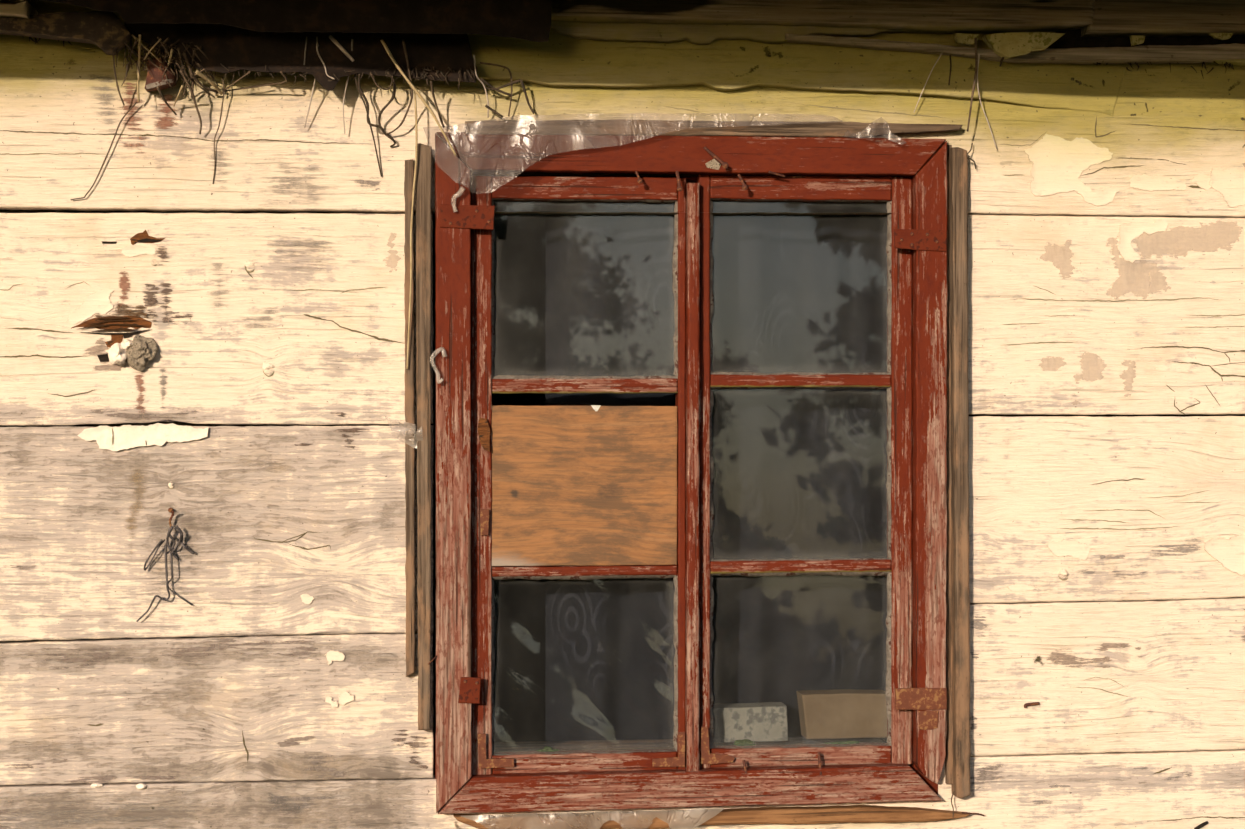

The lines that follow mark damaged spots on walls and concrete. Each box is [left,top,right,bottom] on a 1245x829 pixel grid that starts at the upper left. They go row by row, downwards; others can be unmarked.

peeling [1024,133,1245,207]
rust [119,271,130,306]
peeling [1040,240,1077,279]
peeling [1105,220,1243,299]
crack [1003,286,1245,414]
rust [135,372,145,413]